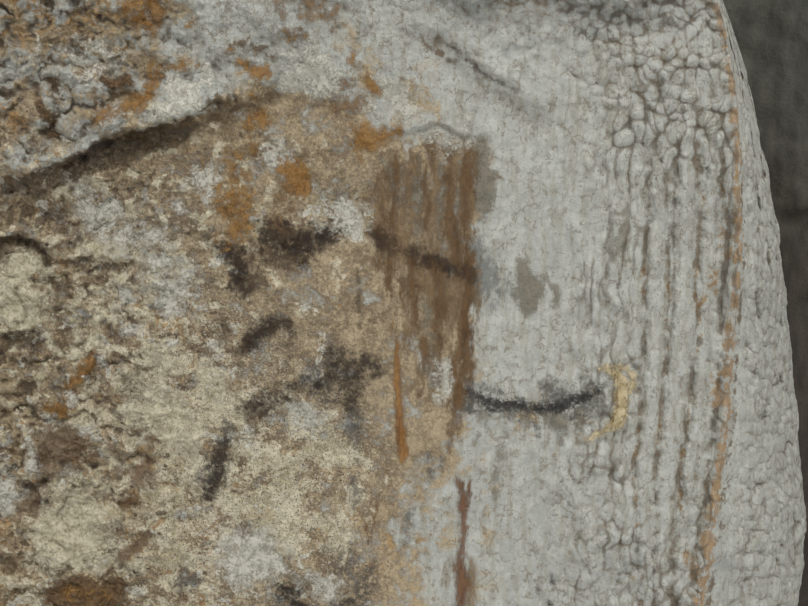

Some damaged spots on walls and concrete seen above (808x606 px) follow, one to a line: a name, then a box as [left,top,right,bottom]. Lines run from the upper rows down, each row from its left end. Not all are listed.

corrosion [274,0,341,44]
corrosion [325,74,403,159]
corrosion [362,132,482,464]
corrosion [444,479,475,606]